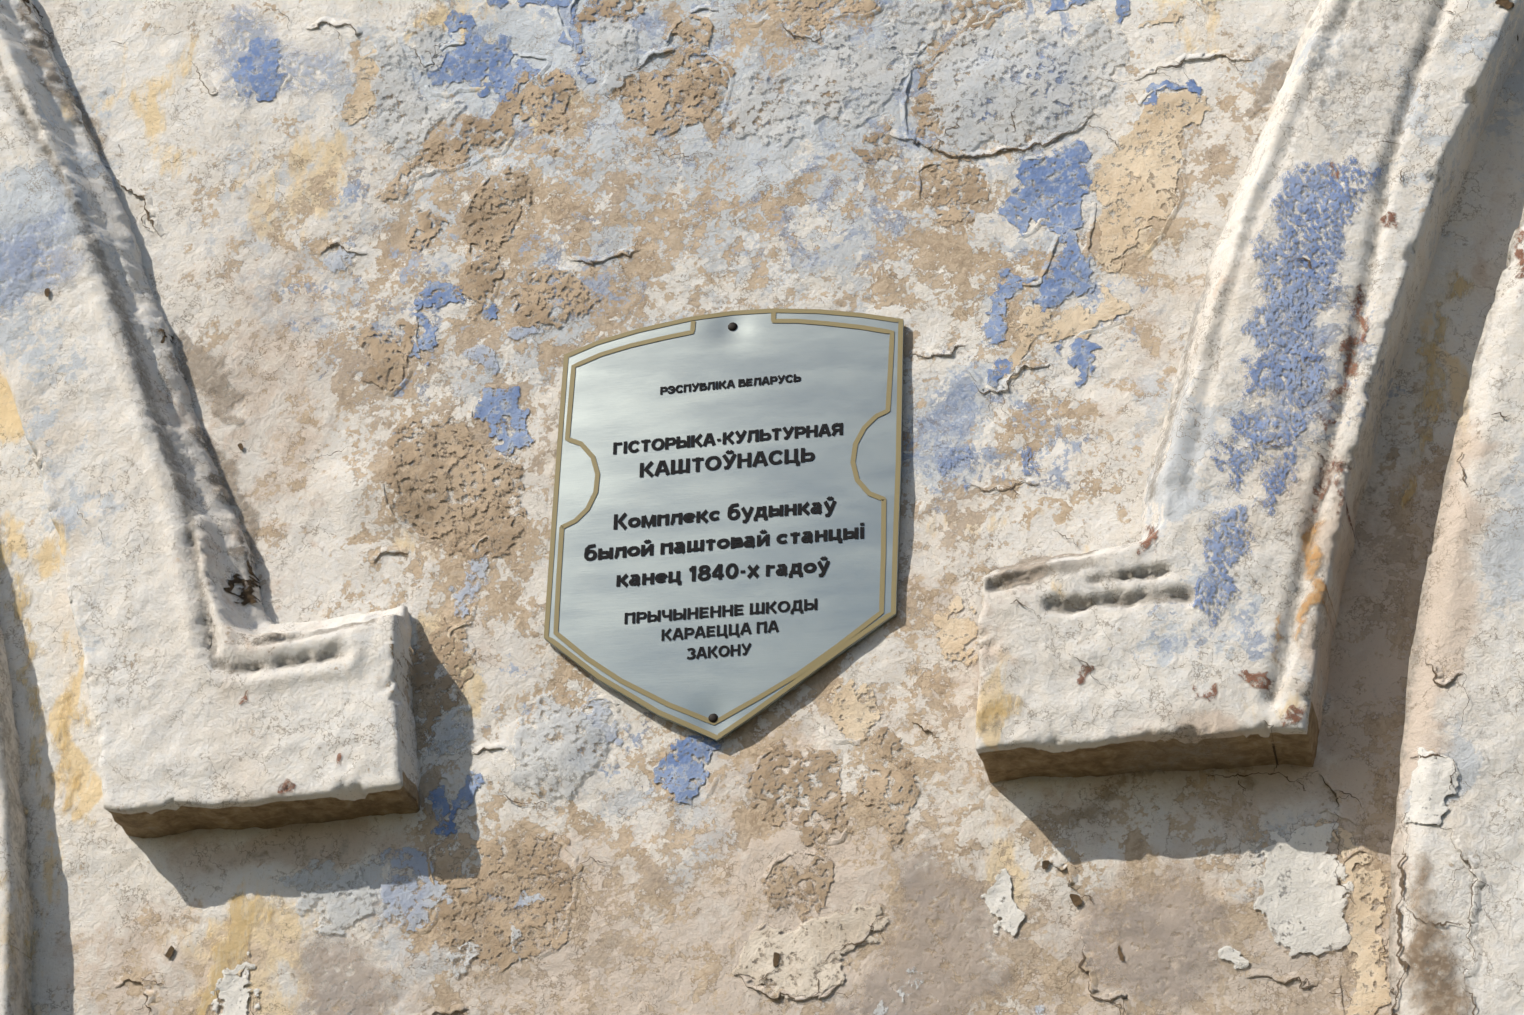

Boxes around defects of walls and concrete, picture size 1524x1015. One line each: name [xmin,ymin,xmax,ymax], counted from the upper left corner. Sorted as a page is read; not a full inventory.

flaking render [222,0,1219,397]
crack [882,49,1253,158]
flaking render [378,344,534,739]
corrosion [1077,665,1094,684]
corrosion [1238,670,1271,690]
corrosion [1282,705,1304,727]
flaking render [279,771,583,977]
crack [738,915,884,1001]
flaking render [732,679,919,999]
crack [1046,856,1133,1015]
peeling [1248,806,1391,1015]
crack [1378,659,1496,1015]